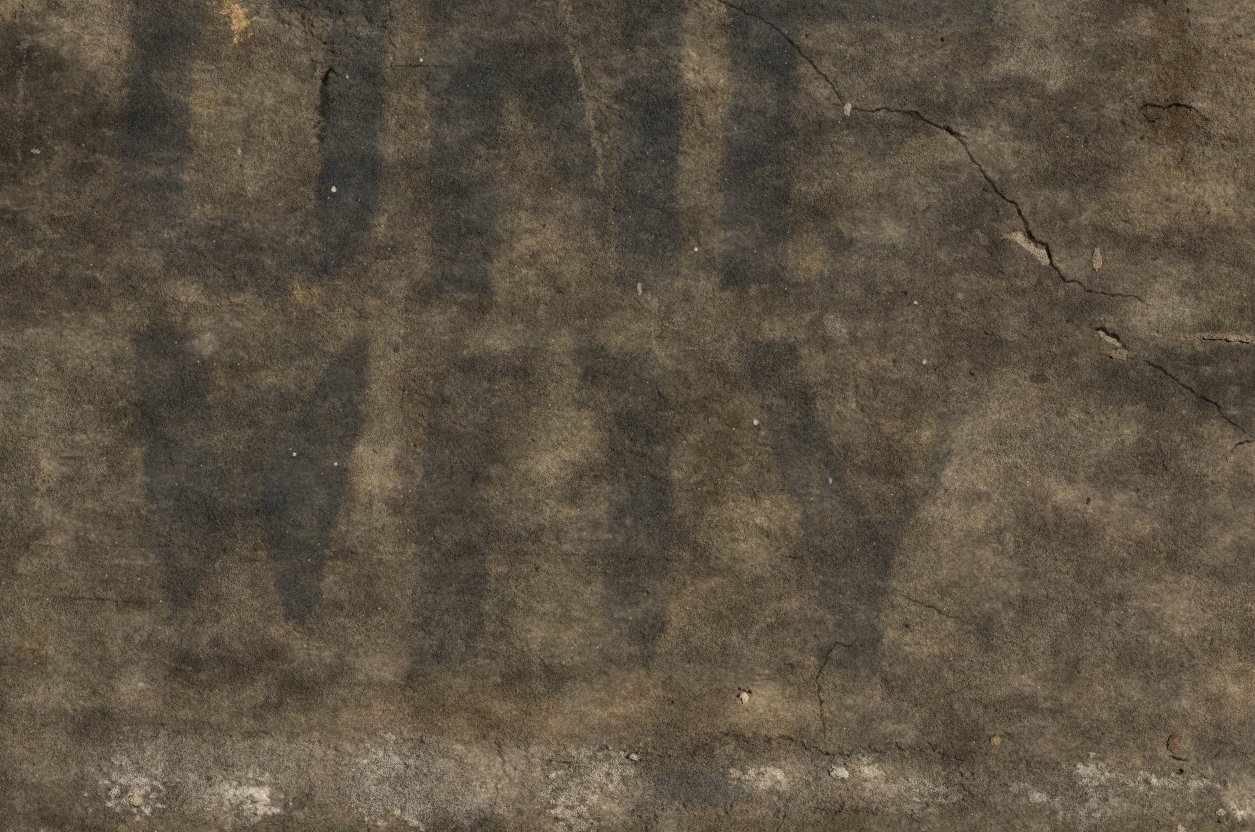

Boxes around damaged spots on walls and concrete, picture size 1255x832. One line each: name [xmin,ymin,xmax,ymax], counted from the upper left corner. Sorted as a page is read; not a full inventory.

crack [1142,103,1190,122]
crack [875,108,1113,296]
crack [1095,327,1250,446]
leakage [84,747,291,831]
leakage [339,725,479,832]
leakage [531,742,641,832]
leakage [718,752,814,790]
leakage [845,749,963,812]
leakage [1009,753,1231,831]
leakage [1216,804,1255,820]